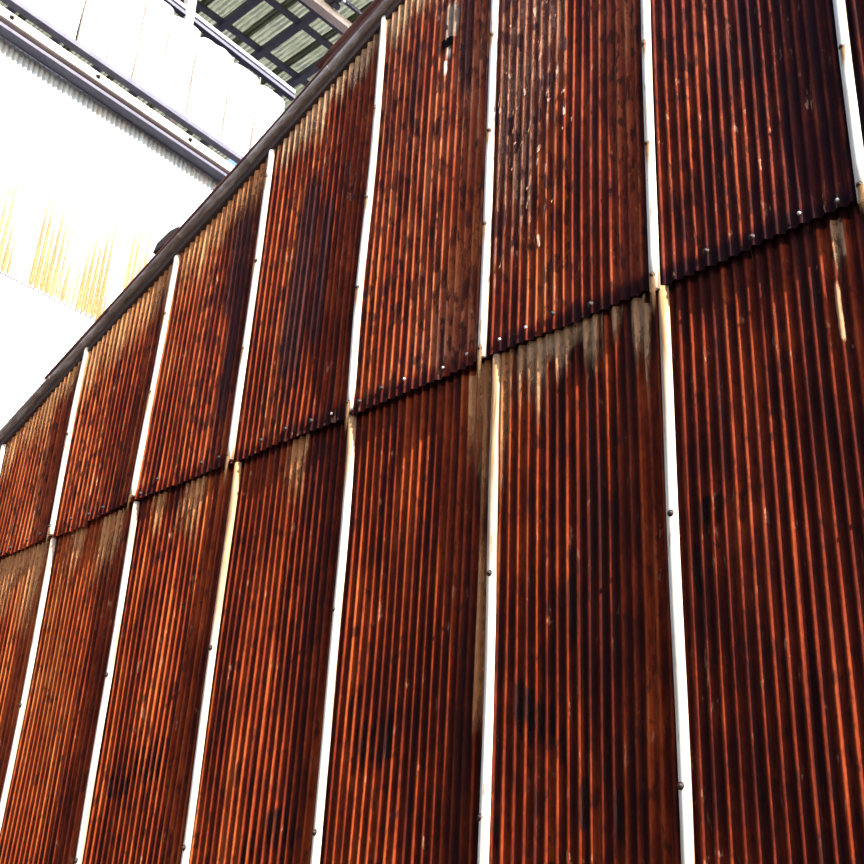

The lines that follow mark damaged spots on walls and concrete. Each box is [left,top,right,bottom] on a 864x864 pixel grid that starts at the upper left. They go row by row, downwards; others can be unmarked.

leakage [443,0,474,94]
corrosion [0,179,23,273]
corrosion [26,187,153,319]
leakage [4,0,422,466]
leakage [70,527,86,563]
leakage [98,508,125,564]
leakage [151,492,167,526]
leakage [181,476,207,524]
leakage [289,434,310,482]
corrosion [468,344,513,492]
corrosion [472,544,497,730]
leakage [515,679,566,764]